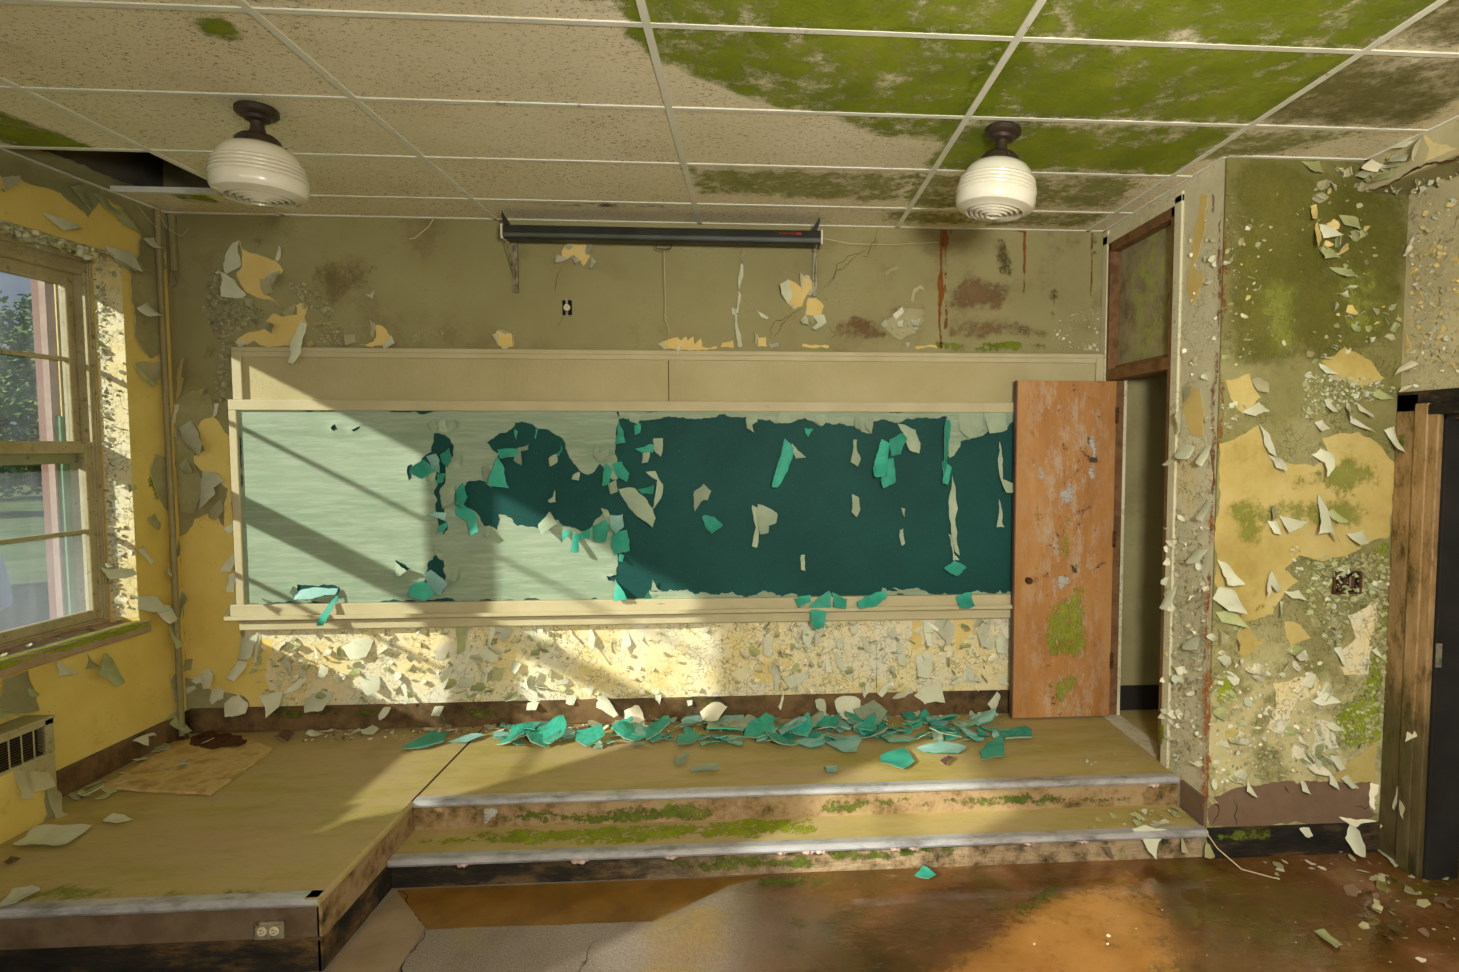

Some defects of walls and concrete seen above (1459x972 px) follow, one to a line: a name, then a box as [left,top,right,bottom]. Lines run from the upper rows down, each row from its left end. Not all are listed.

peeling [0,149,1014,865]
peeling [1095,134,1459,860]